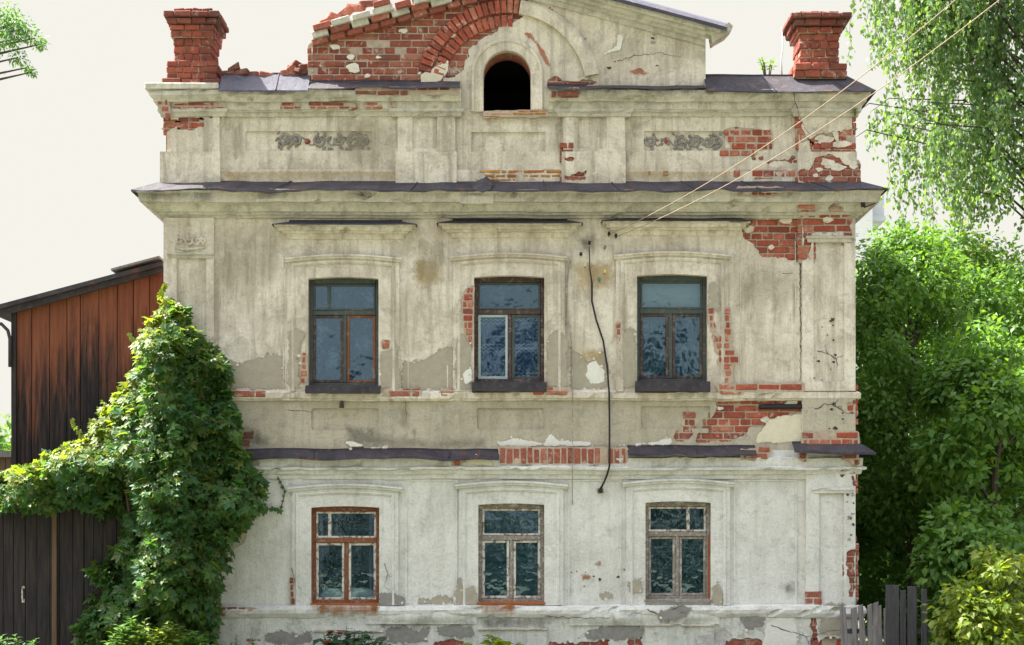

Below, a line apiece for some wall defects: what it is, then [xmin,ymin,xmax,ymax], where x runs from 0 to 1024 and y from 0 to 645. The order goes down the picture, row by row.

spalling [280,0,528,110]
spalling [157,100,227,136]
spalling [720,117,861,197]
spalling [738,204,856,264]
peeling [379,285,475,397]
peeling [533,330,610,395]
spalling [673,282,837,461]
spalling [497,436,629,465]
spalling [798,385,860,645]
peeling [386,624,474,645]
peeling [549,625,644,645]